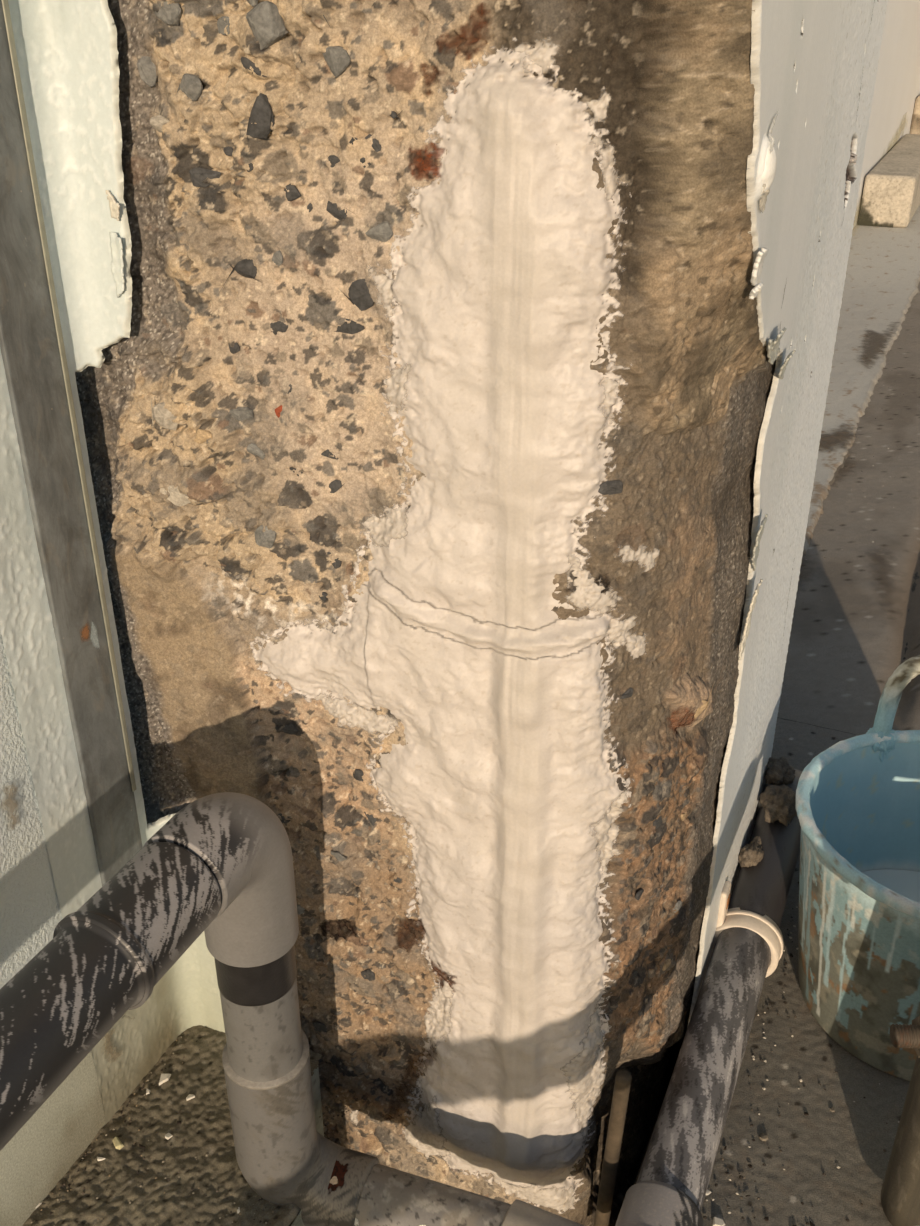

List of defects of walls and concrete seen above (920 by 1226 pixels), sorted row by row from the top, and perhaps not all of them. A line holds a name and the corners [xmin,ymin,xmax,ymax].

corrosion [409,143,444,179]
peeling [844,139,857,204]
spalling [75,0,805,1226]